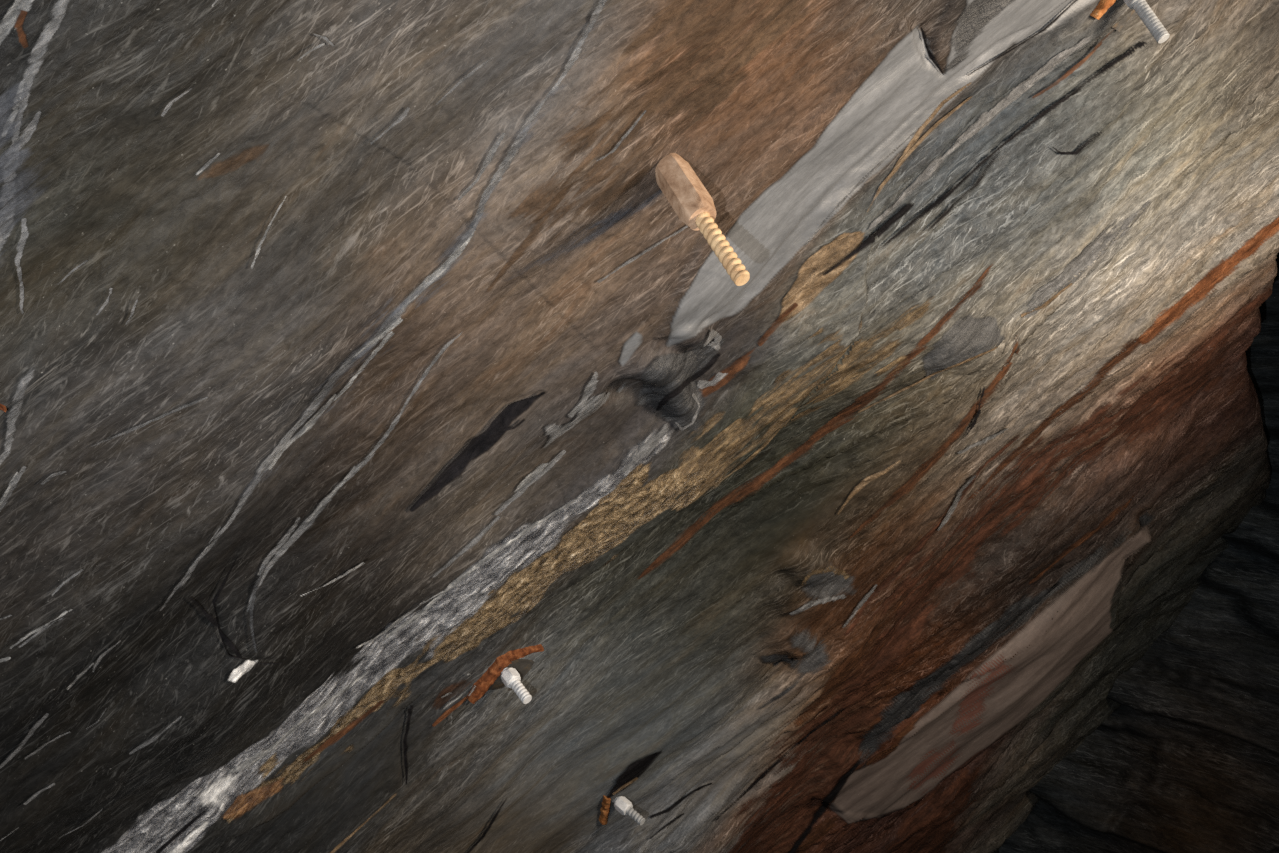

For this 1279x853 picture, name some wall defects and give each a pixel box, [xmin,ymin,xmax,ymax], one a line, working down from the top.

rust [1090,0,1116,20]
crack [410,392,545,512]
rust [432,654,512,726]
rust [599,795,611,825]